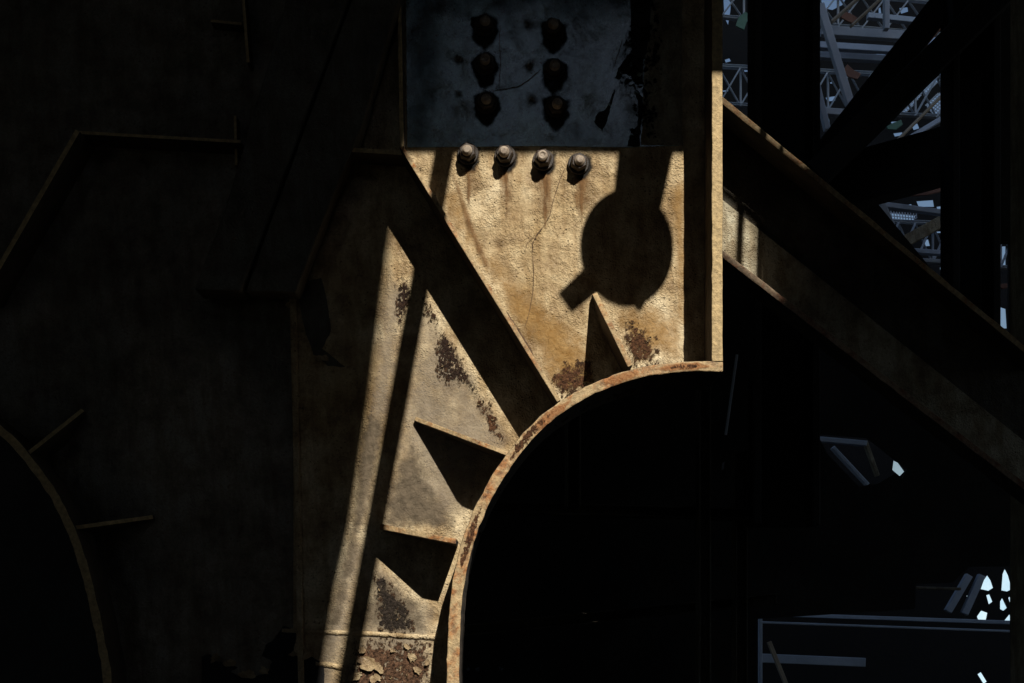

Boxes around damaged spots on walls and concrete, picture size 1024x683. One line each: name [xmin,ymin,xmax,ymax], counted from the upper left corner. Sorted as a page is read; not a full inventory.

crack [507,171,564,356]
rust [630,318,671,350]
peeling [348,571,433,683]